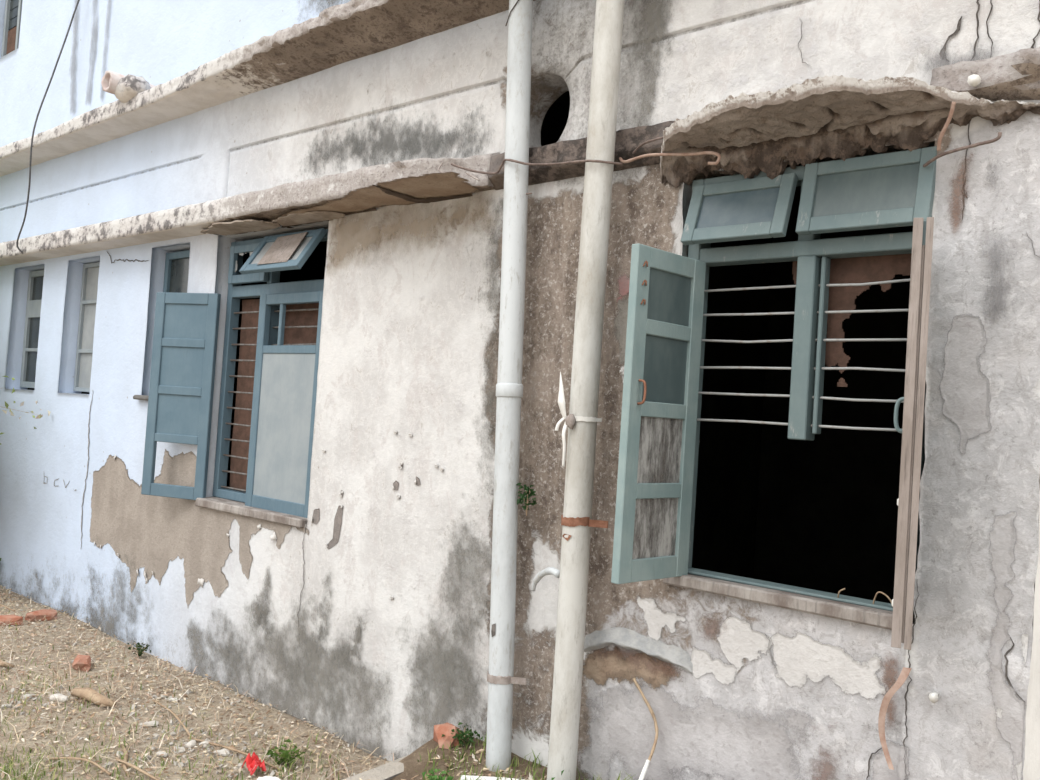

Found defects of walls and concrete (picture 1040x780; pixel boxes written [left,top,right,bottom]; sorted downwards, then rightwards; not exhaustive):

crack [939,0,993,60]
crack [1031,0,1040,48]
damp [304,113,485,174]
spalling [200,172,479,236]
flaking render [90,449,320,606]
peeling [325,490,343,549]
damp [187,526,491,760]
peeling [637,596,686,641]
peeling [691,616,886,701]
rust [883,659,897,721]
crack [866,585,919,779]
crack [1004,634,1025,702]